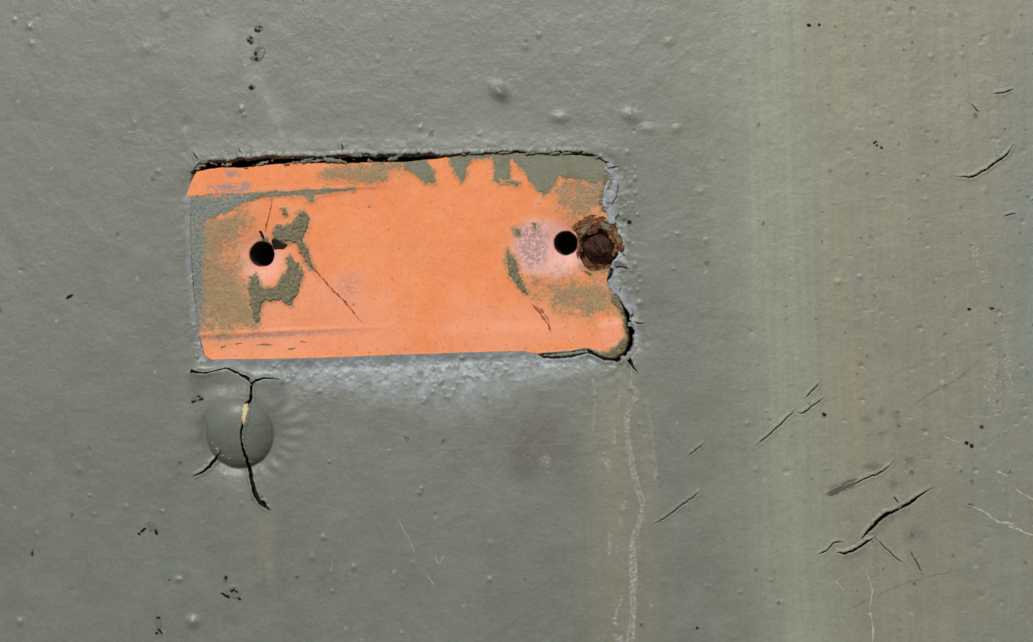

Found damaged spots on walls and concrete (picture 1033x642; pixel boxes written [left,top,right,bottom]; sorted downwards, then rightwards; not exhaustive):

crack [969,86,1015,115]
crack [955,142,1017,182]
crack [1003,196,1033,220]
peeling [186,148,633,360]
crack [191,364,285,513]
leakage [181,156,660,642]
crack [753,379,827,450]
crack [650,486,704,528]
crack [816,458,935,576]